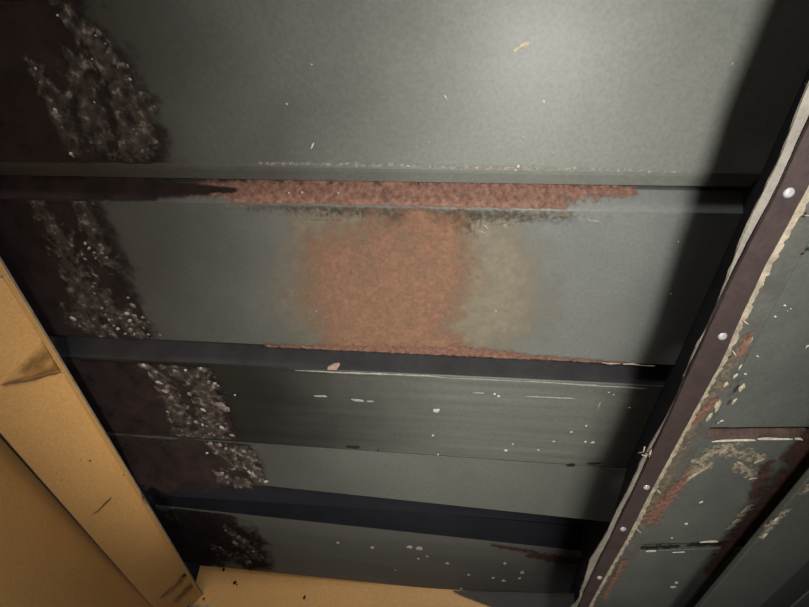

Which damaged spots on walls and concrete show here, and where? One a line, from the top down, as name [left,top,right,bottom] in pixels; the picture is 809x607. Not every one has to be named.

rust [0,175,653,366]
peeling [681,441,766,484]
peeling [759,509,790,539]